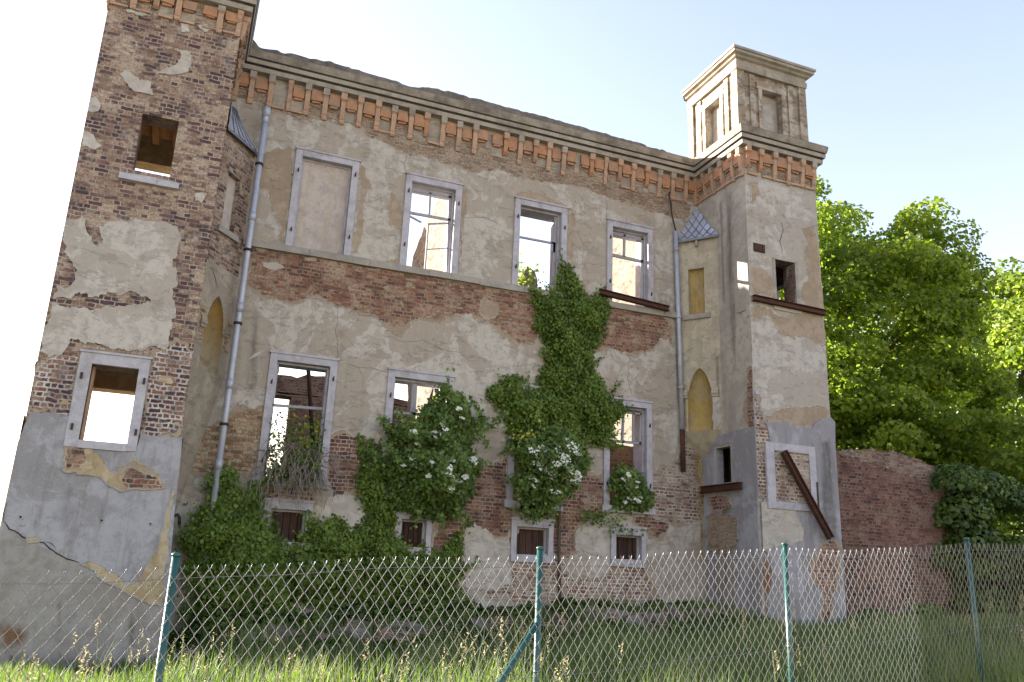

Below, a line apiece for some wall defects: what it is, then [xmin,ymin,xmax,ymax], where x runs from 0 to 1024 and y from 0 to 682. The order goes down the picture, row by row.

flaking render [29,215,208,438]
flaking render [247,145,543,348]
flaking render [591,308,675,357]
crack [3,504,79,563]
spalling [61,446,176,607]
flaking render [431,455,659,606]
flaking render [632,438,739,555]
flaking render [742,365,830,576]